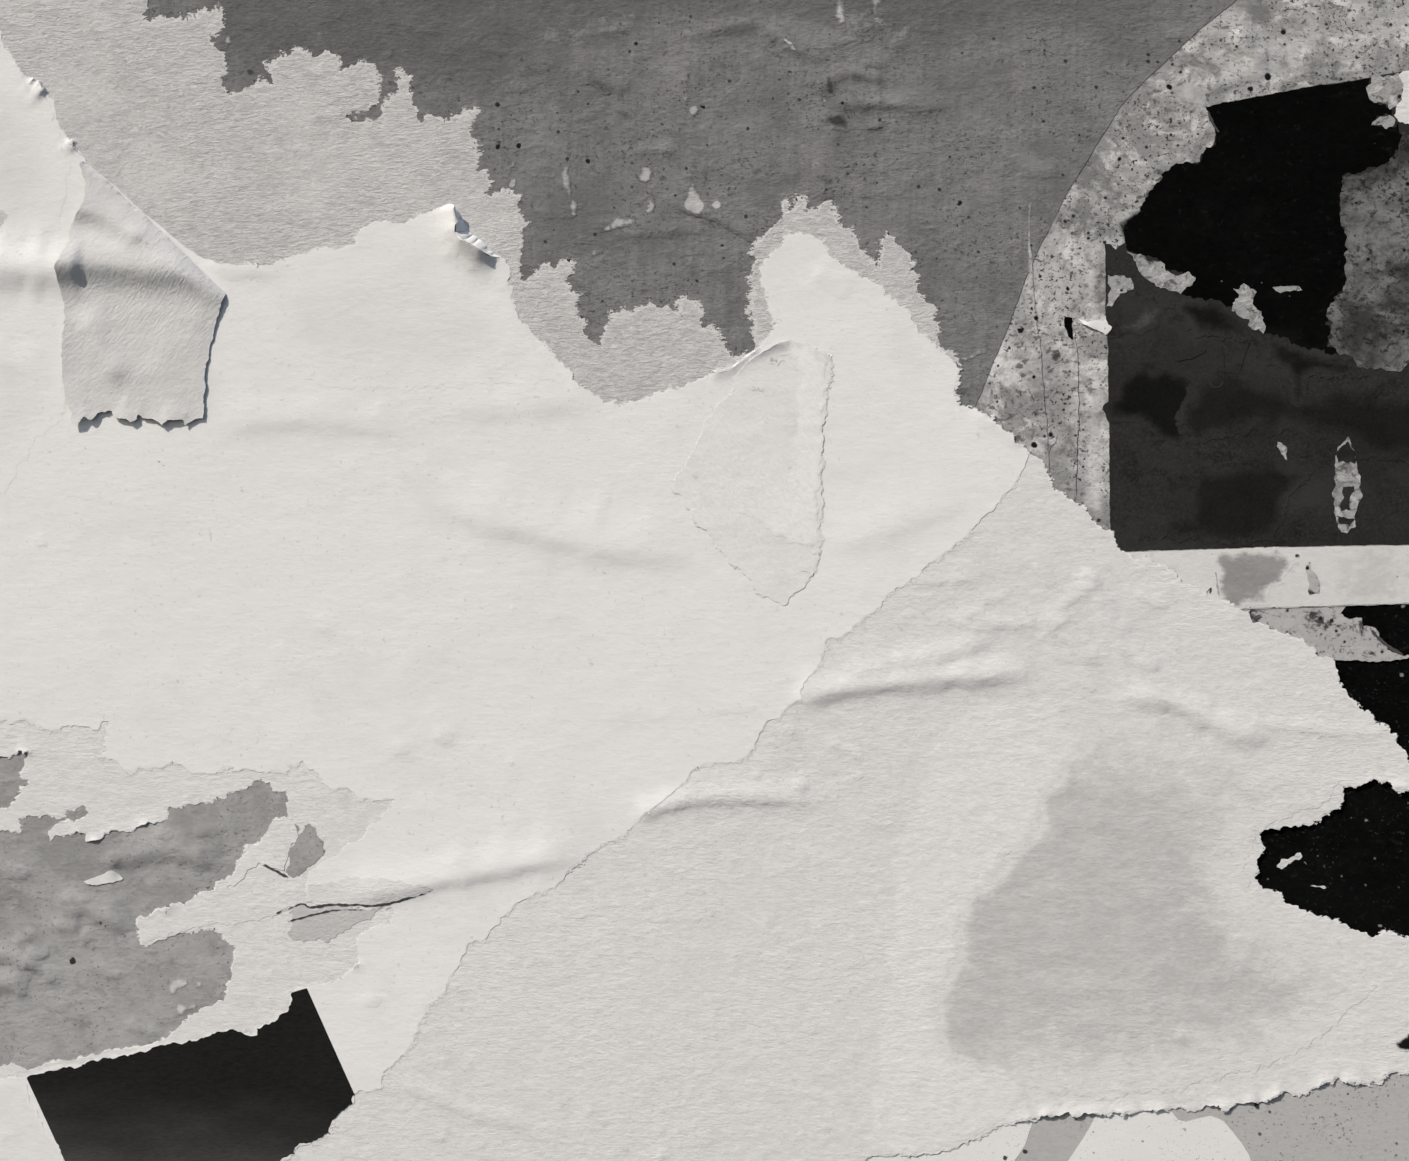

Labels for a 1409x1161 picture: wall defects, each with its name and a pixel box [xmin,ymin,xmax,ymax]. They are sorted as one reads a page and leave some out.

peeling [1326,70,1409,372]
peeling [1074,252,1196,335]
peeling [1232,283,1266,333]
peeling [1273,285,1302,293]
peeling [1332,436,1363,534]
peeling [1213,546,1320,610]
peeling [1340,604,1409,655]
peeling [84,870,123,885]
peeling [140,823,432,943]
crack [264,864,426,922]
peeling [167,976,203,1018]